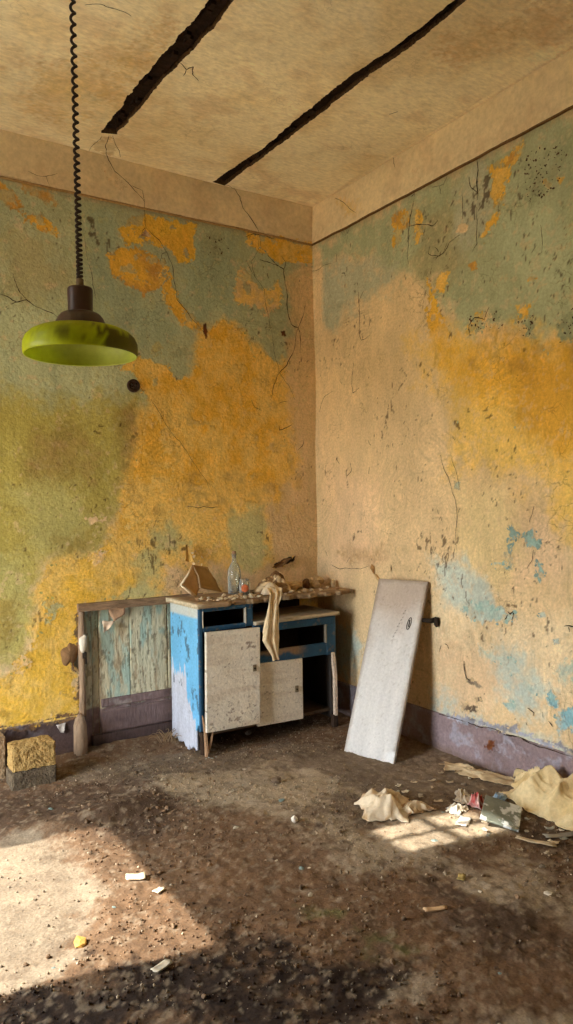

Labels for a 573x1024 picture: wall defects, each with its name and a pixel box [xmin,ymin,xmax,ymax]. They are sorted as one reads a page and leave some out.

crack [90,137,201,329]
peeling [334,193,364,223]
peeling [389,207,426,253]
peeling [455,125,573,245]
peeling [432,269,451,296]
crack [225,184,305,450]
peeling [461,301,537,343]
peeling [554,308,573,344]
peeling [0,211,313,735]
peeling [491,523,547,584]
peeling [459,594,519,631]